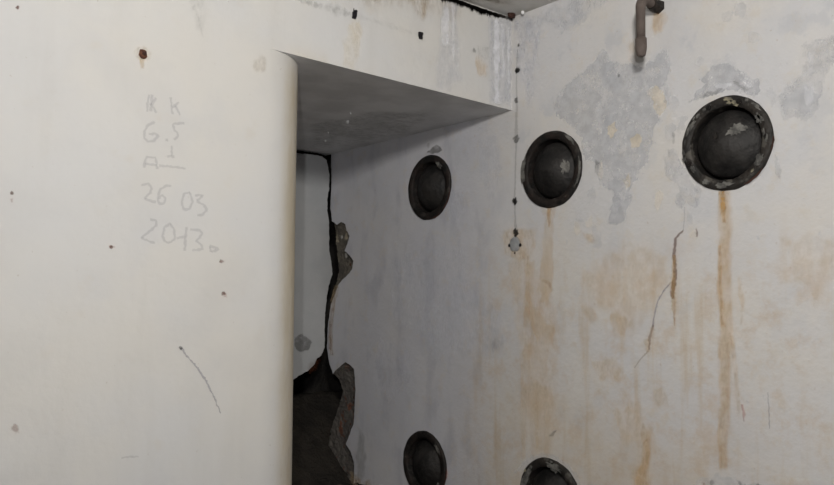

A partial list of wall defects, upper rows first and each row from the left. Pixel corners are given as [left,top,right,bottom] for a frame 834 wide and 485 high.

peeling [560,156,581,184]
spalling [332,222,353,299]
spalling [328,362,355,484]